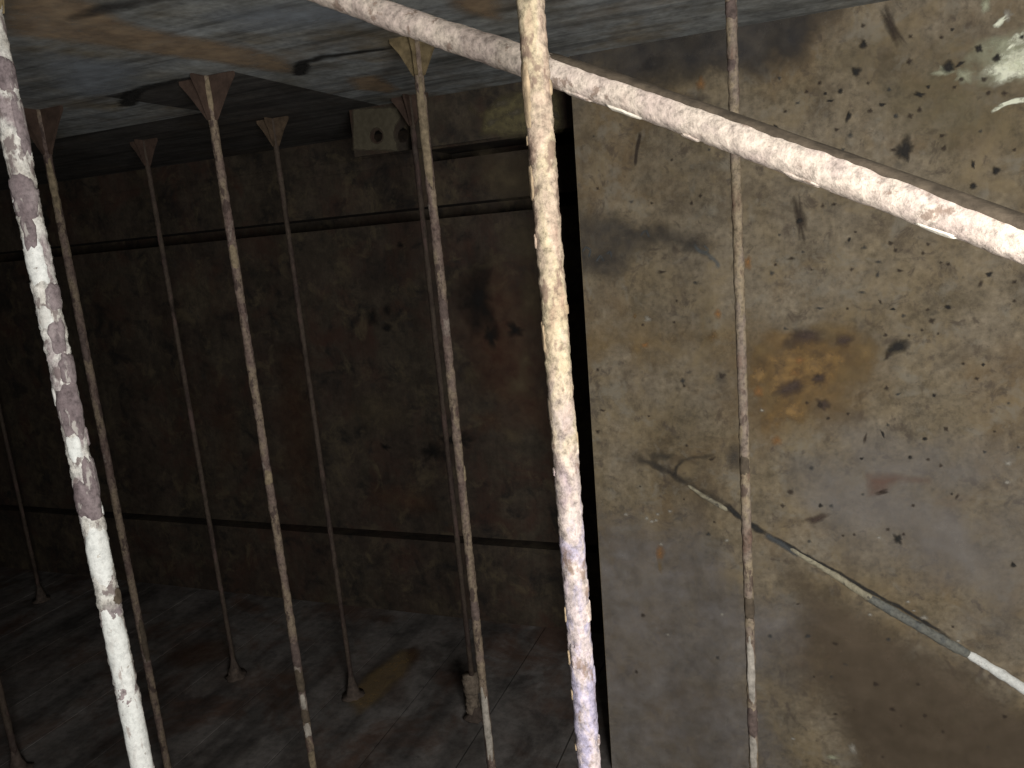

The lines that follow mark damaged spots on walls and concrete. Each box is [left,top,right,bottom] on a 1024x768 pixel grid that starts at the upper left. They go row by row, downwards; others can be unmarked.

efflorescence [989,33,1024,83]
efflorescence [993,98,1024,112]
corrosion [750,328,872,429]
crack [688,485,1024,695]